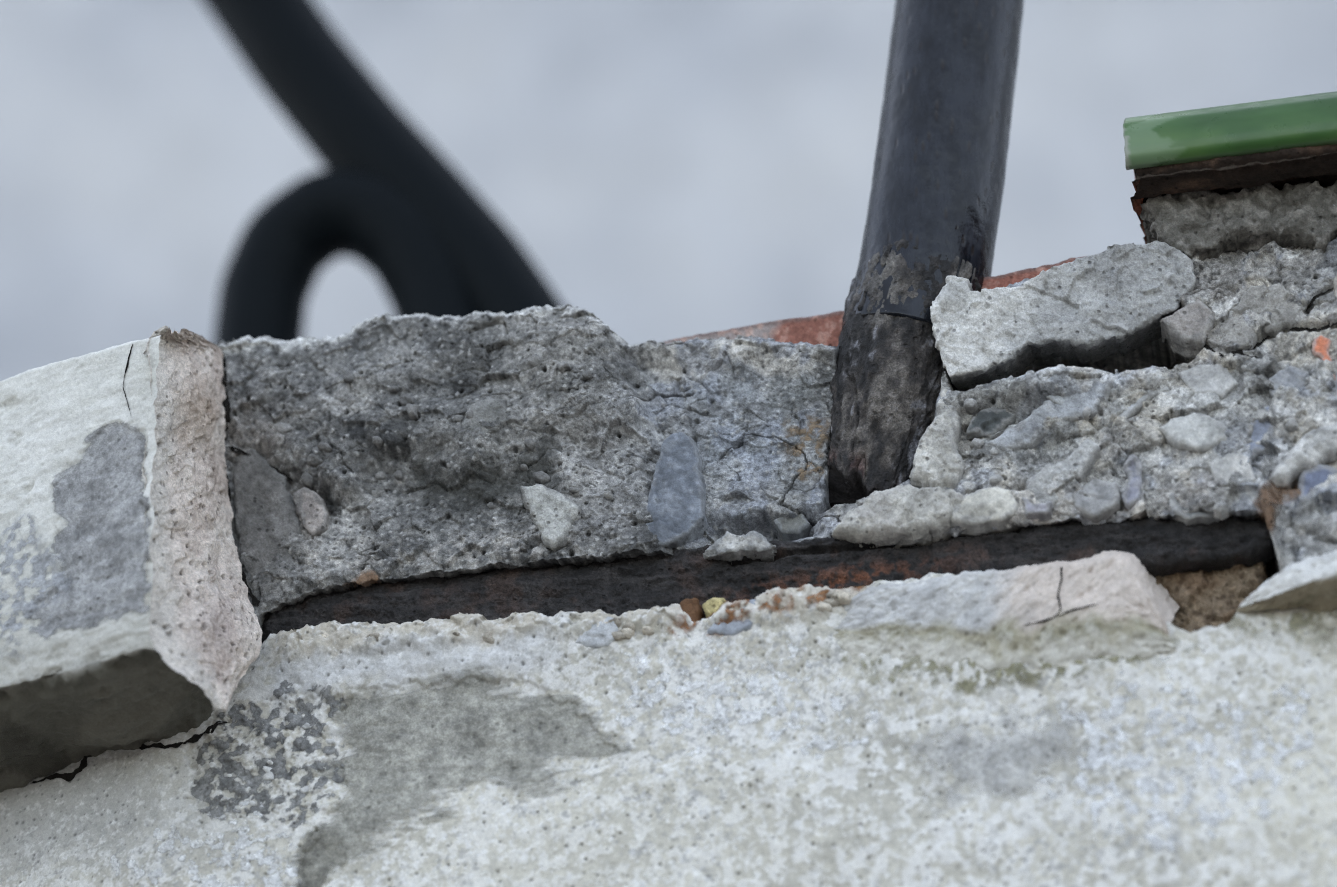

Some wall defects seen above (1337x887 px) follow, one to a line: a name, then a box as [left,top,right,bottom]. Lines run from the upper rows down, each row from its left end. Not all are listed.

crack [1201,288,1337,358]
spalling [215,237,1337,629]
rust [262,483,1300,643]
crack [32,755,93,783]
crack [139,721,228,750]